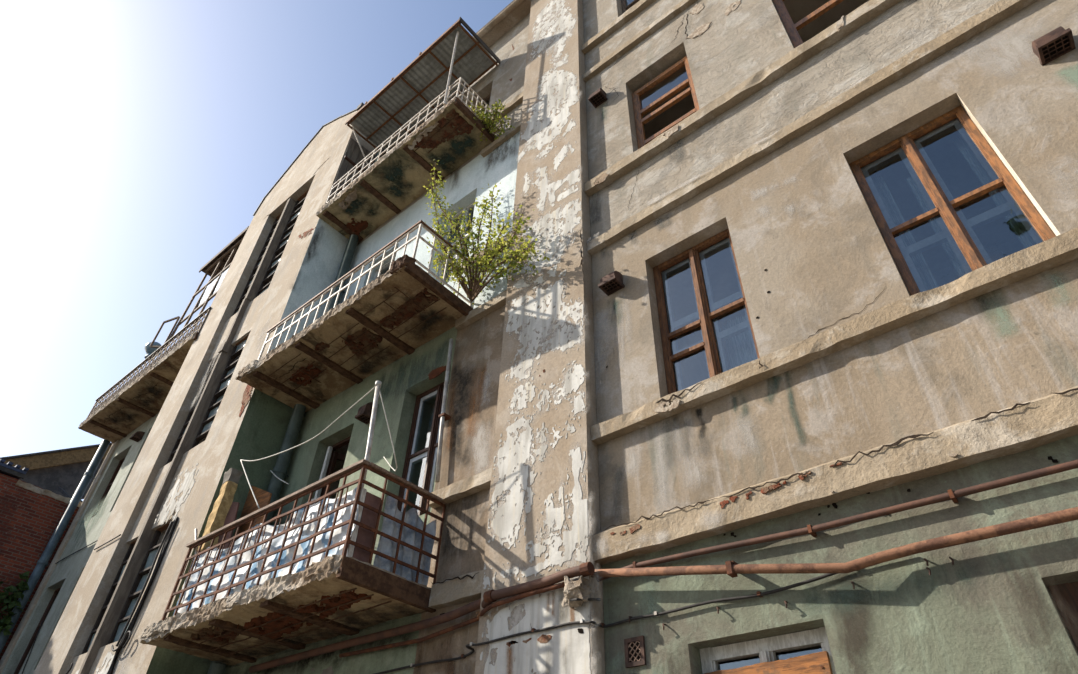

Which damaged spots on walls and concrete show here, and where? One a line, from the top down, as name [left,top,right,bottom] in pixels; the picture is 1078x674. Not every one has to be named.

peeling [480,0,609,674]
spalling [239,385,253,417]
leakage [447,369,546,469]
crack [656,383,700,403]
crack [971,402,1030,421]
peeling [154,463,199,526]
spalling [719,481,786,508]
crack [604,432,933,531]
spalling [190,588,392,656]
peeling [93,648,114,674]